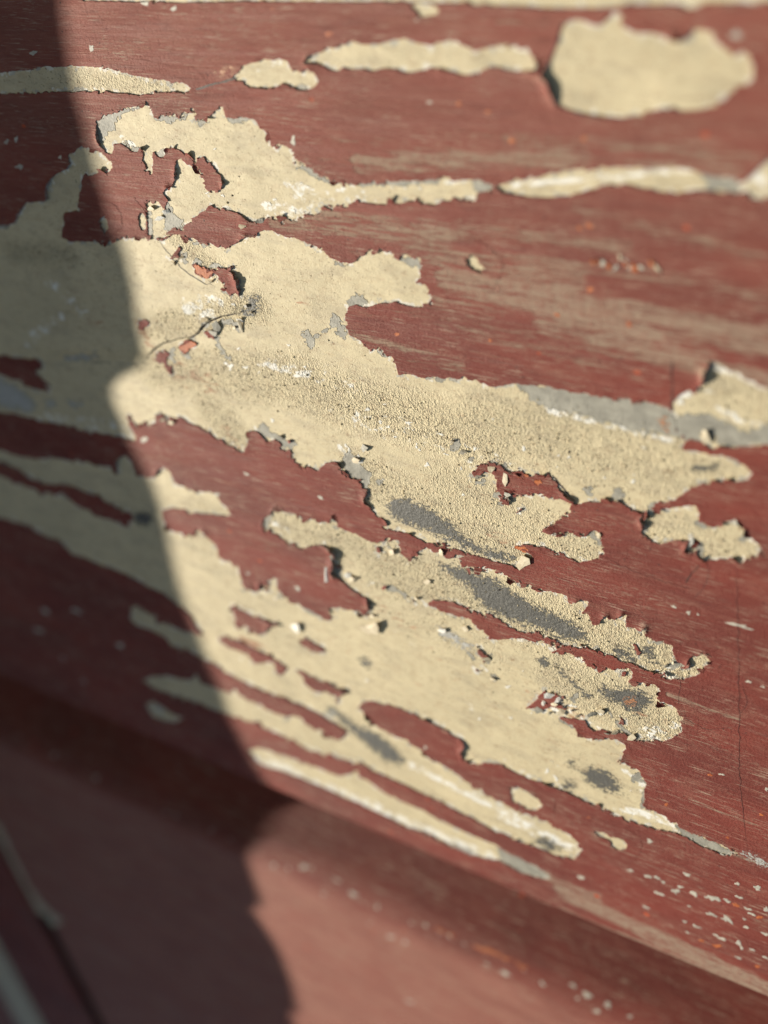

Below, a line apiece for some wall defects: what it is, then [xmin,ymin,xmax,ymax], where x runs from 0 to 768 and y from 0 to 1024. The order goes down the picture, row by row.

peeling [0,439,755,893]
peeling [0,0,768,696]